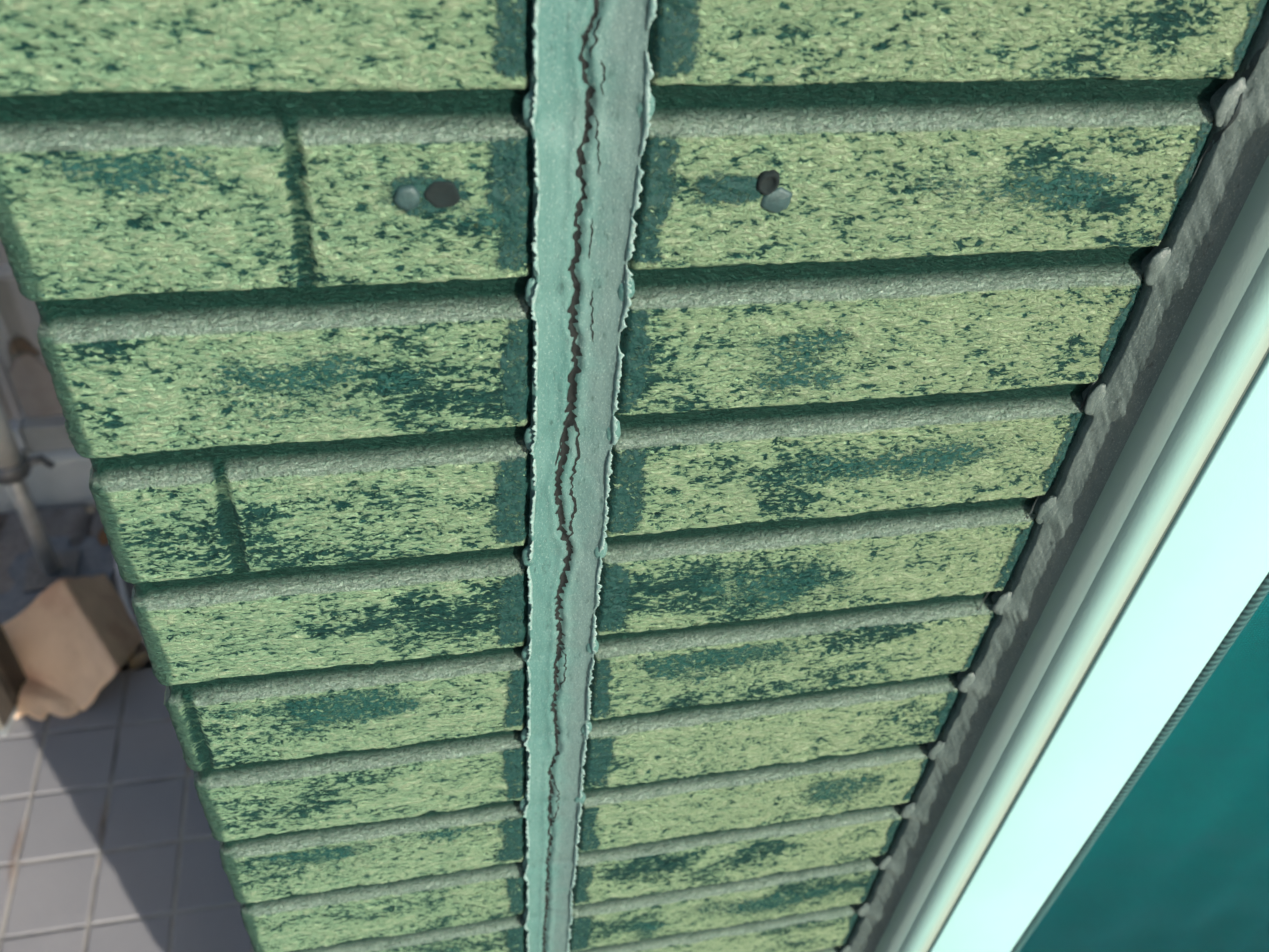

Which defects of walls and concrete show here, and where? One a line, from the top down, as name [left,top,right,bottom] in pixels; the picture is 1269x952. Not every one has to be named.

crack [541,0,606,952]